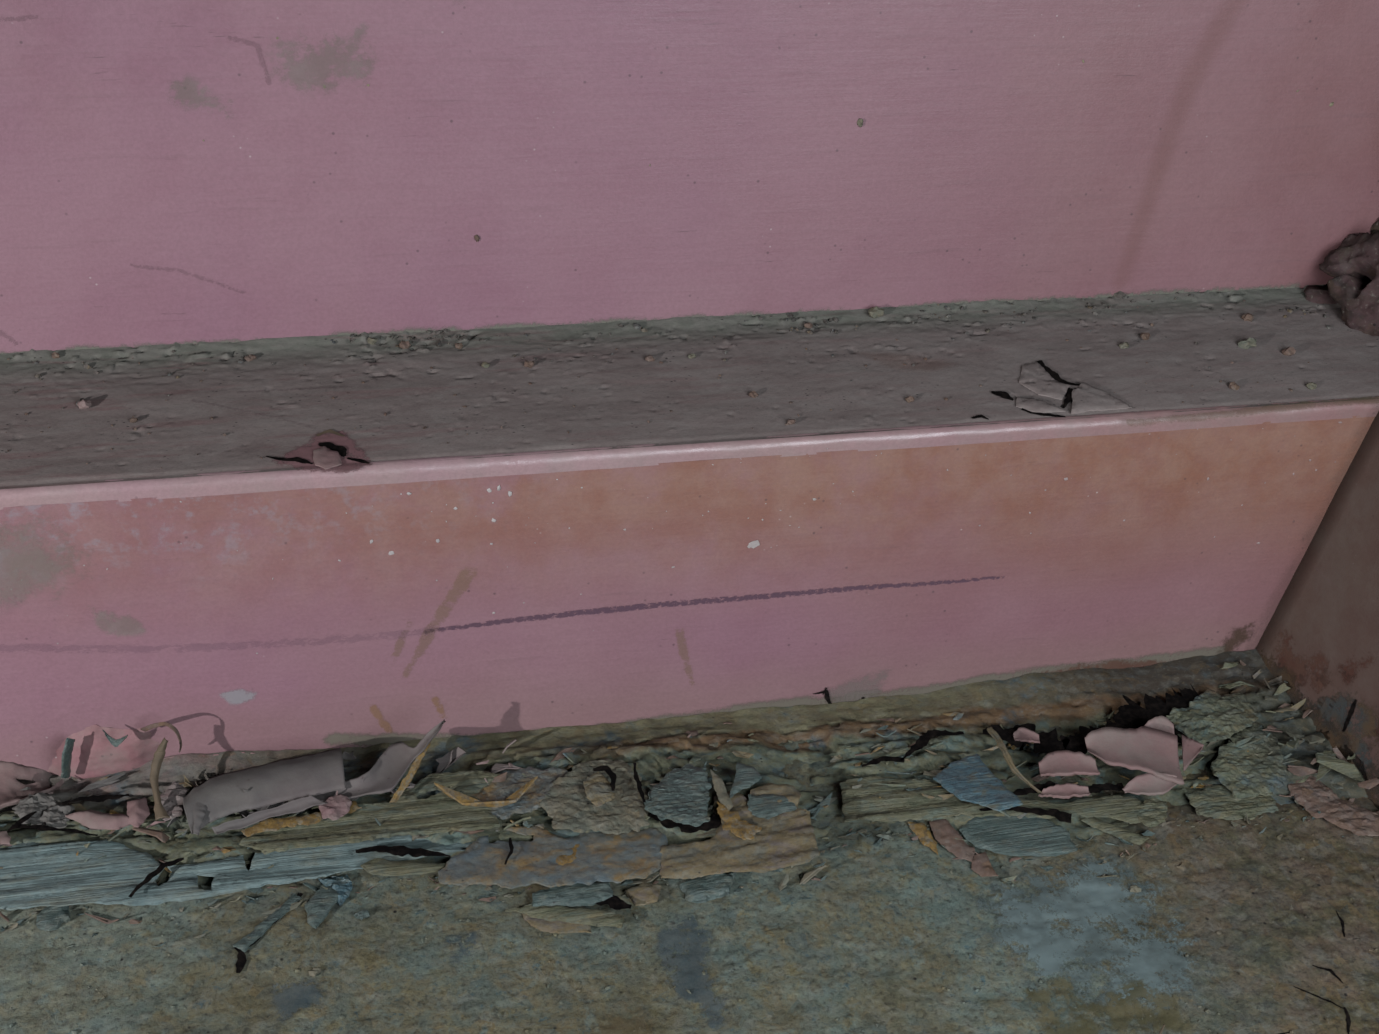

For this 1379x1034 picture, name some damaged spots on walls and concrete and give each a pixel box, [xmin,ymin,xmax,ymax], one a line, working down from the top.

spalling [862,729,964,767]
spalling [979,685,1209,823]
peeling [183,720,446,837]
peeling [65,797,150,830]
peeling [0,831,11,845]